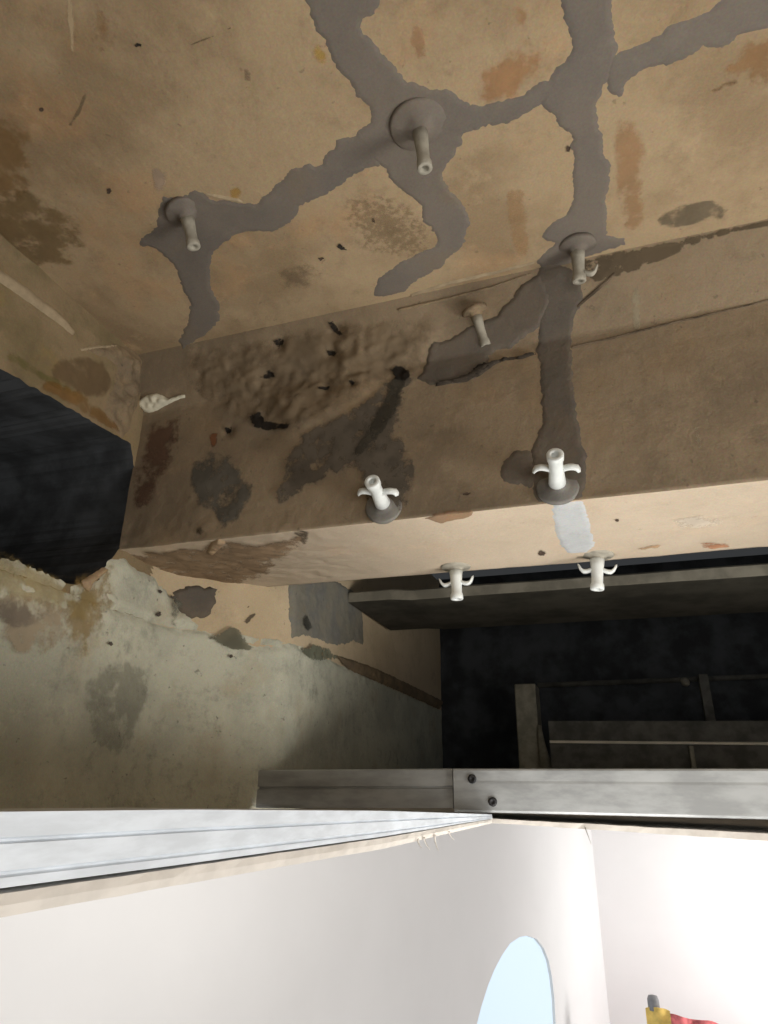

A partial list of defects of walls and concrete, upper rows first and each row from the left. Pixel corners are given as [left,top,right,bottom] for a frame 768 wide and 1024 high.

crack [139,0,768,553]
water stain [191,453,252,525]
spalling [133,537,301,584]
spalling [337,655,443,709]